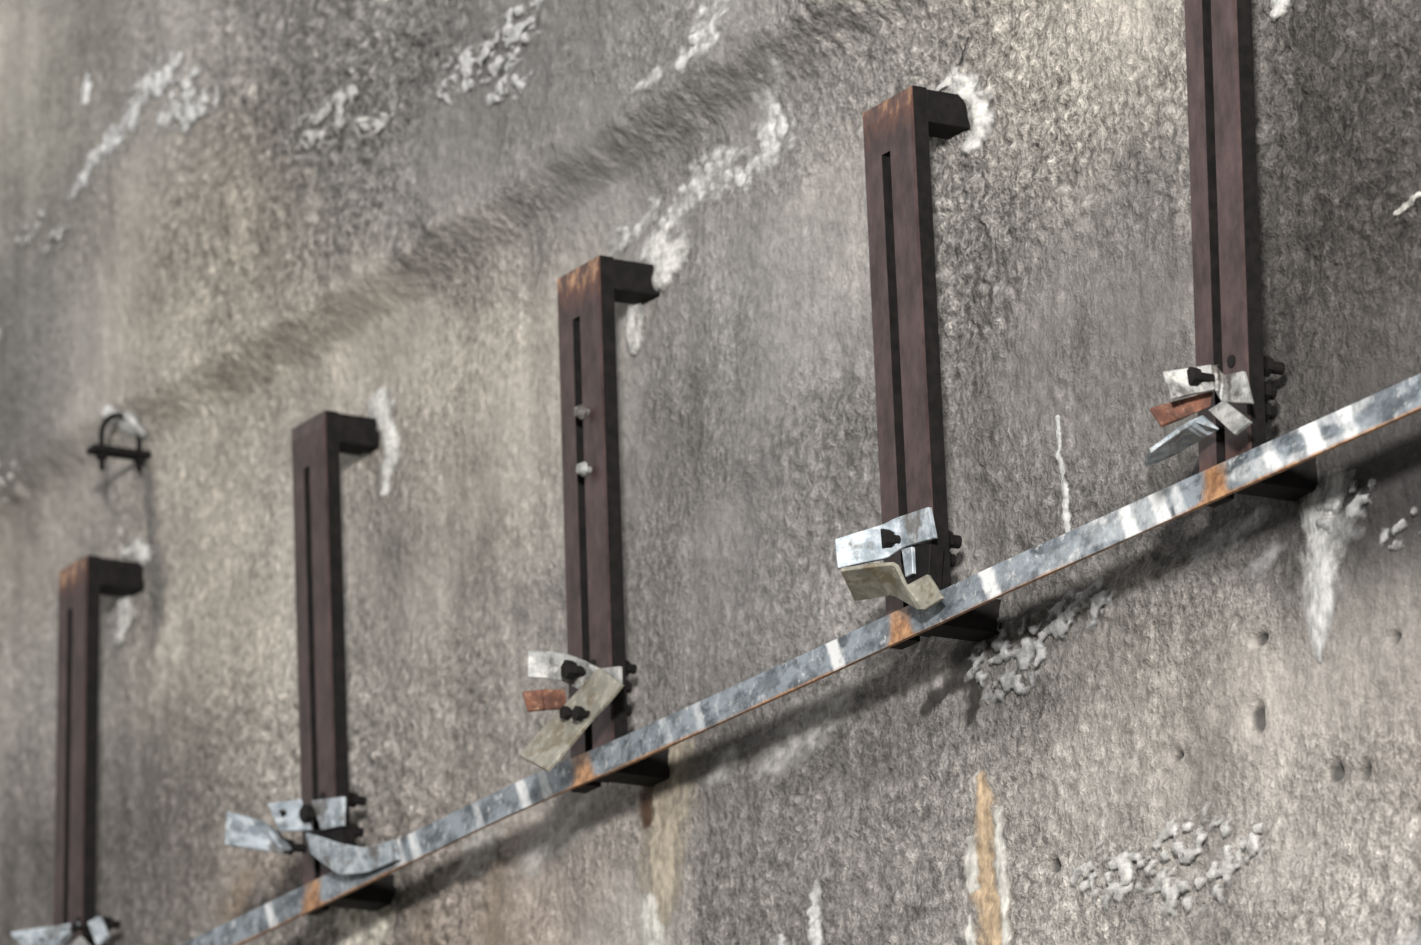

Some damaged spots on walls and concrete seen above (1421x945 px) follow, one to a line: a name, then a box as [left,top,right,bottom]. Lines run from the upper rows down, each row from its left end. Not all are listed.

damp [81,73,92,106]
spalling [1315,478,1374,533]
spalling [1379,507,1416,549]
spalling [965,577,1116,702]
corrosion [640,785,655,827]
corrosion [964,772,1012,945]
spalling [1055,805,1264,916]
efflorescence [807,879,822,945]